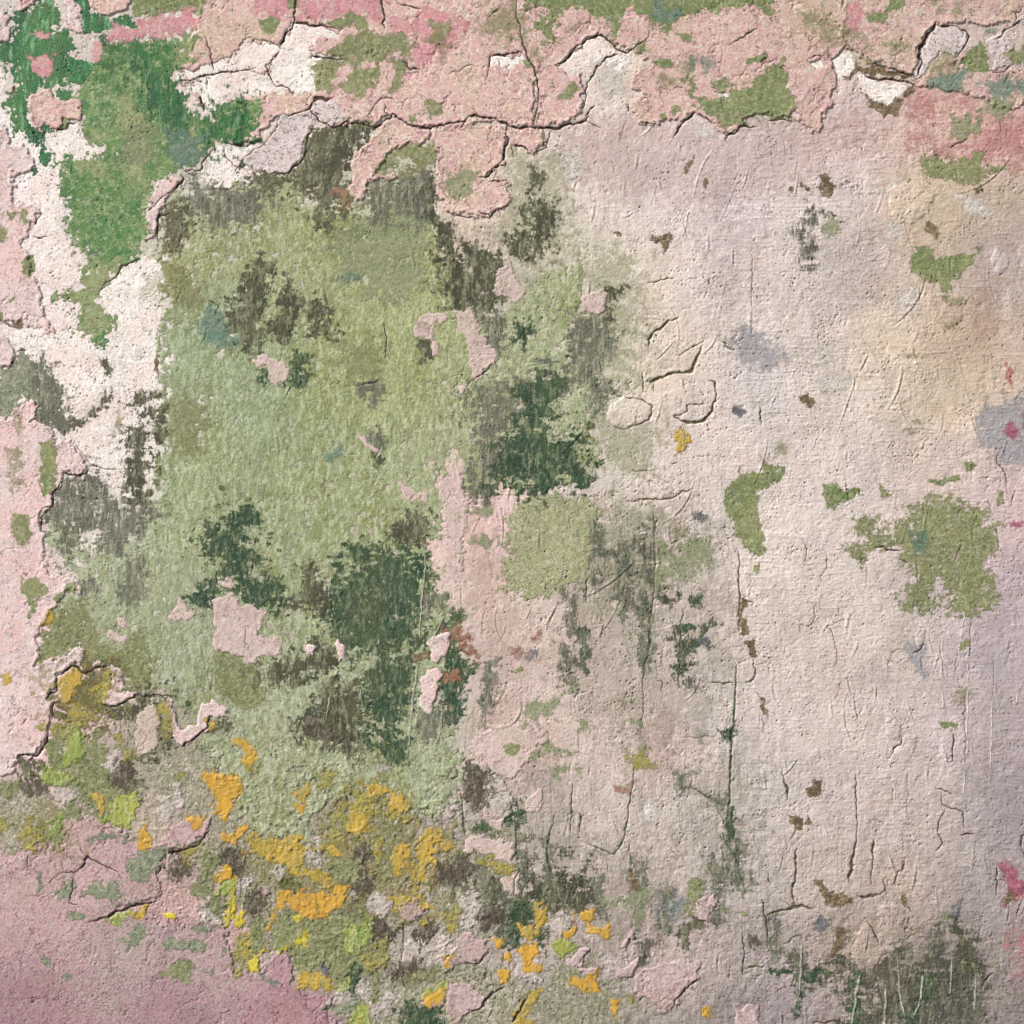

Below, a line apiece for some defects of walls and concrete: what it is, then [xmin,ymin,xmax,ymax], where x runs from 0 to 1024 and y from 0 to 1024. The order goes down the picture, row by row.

crack [149,0,794,238]
flaking render [857,74,912,106]
crack [862,8,1024,87]
peeling [920,151,1007,219]
crack [616,329,740,430]
peeling [396,456,517,571]
leakage [181,486,542,772]
peeling [419,632,450,714]
leakage [554,490,723,694]
crack [29,850,158,923]
leakage [624,792,759,967]
leakage [748,877,1024,1024]